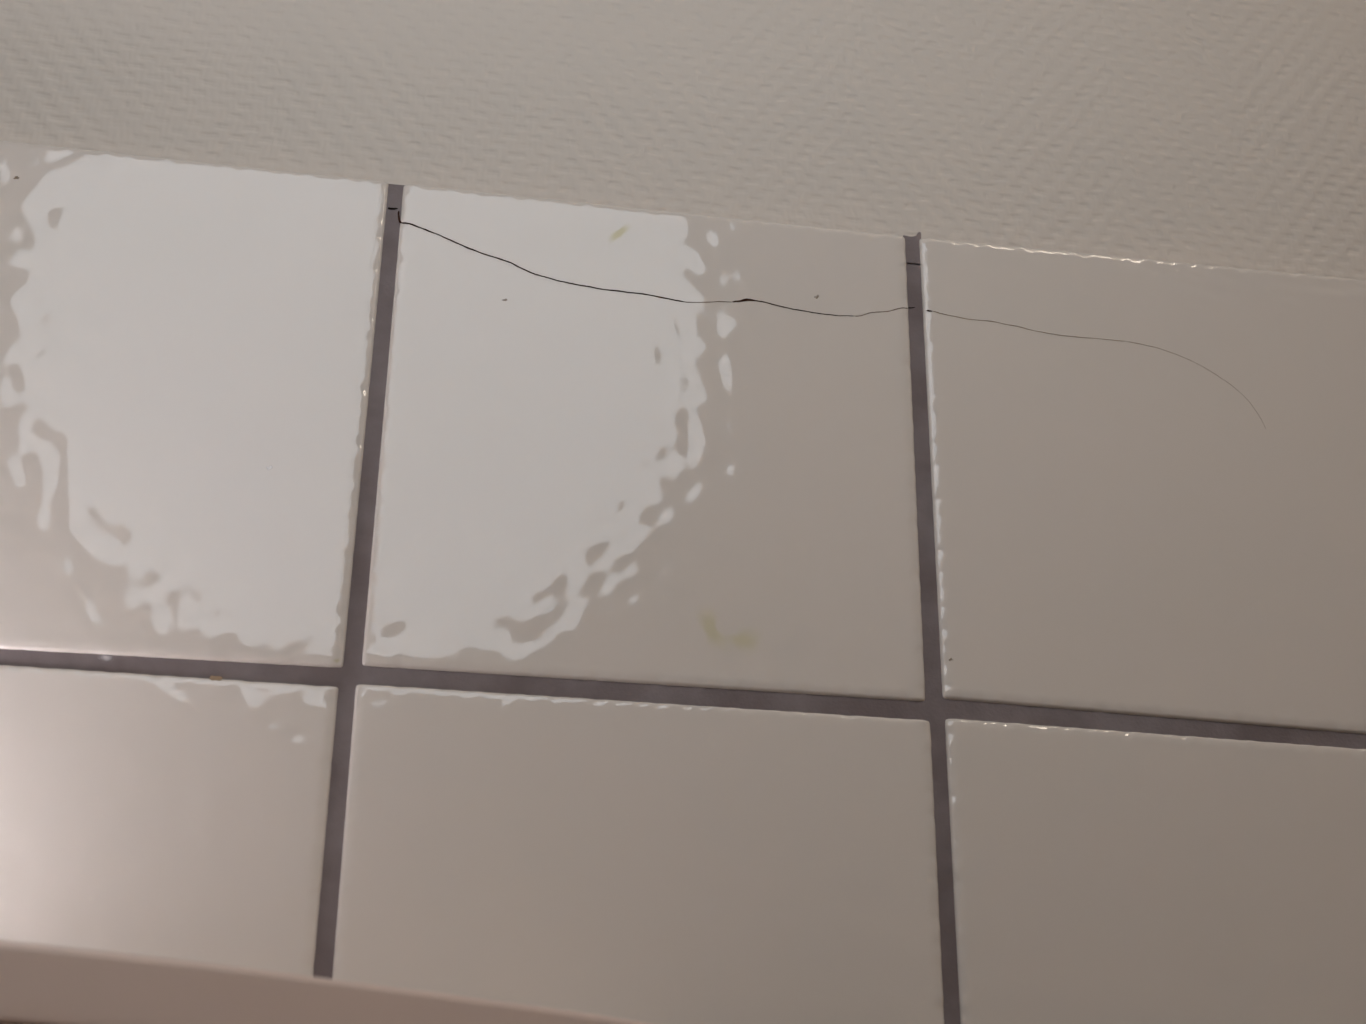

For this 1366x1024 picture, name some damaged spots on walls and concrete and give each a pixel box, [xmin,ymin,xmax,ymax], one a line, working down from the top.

crack [388,207,1265,426]